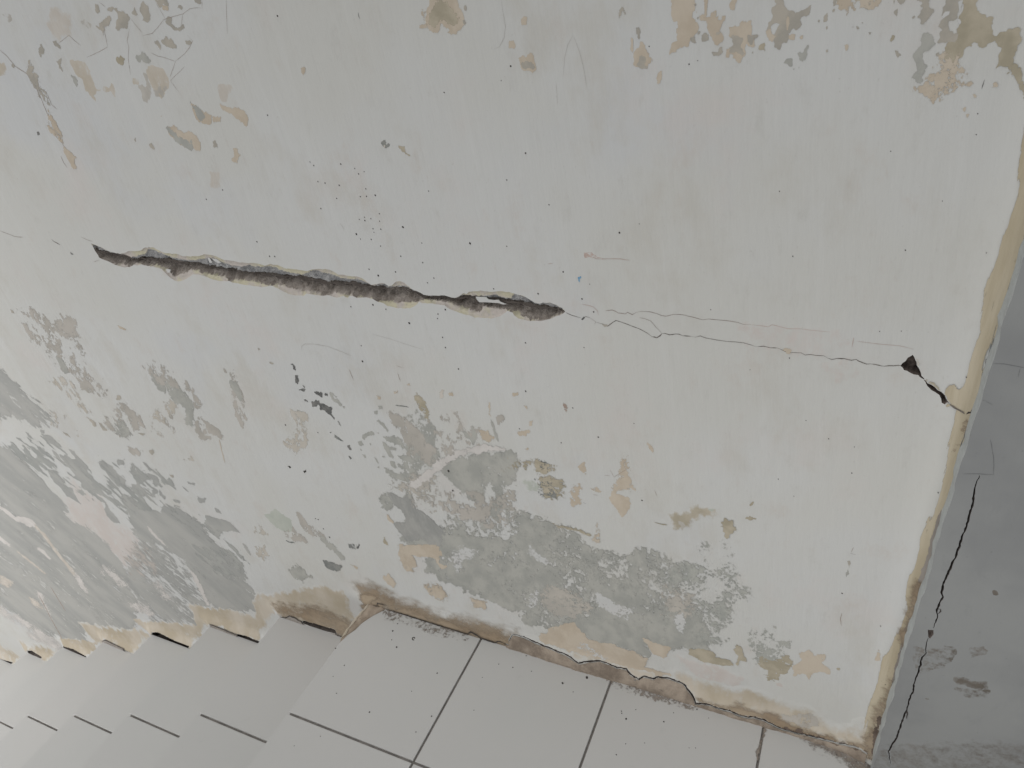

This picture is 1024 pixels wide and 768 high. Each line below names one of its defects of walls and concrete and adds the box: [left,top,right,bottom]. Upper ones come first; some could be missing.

peeling [28,0,201,103]
peeling [419,0,467,35]
peeling [630,27,662,84]
peeling [669,0,881,70]
peeling [890,0,1024,117]
peeling [161,84,248,151]
crack [565,304,911,367]
peeling [0,306,360,642]
peeling [283,363,840,687]
crack [376,603,859,748]
water stain [568,651,881,766]
crack [888,475,980,763]